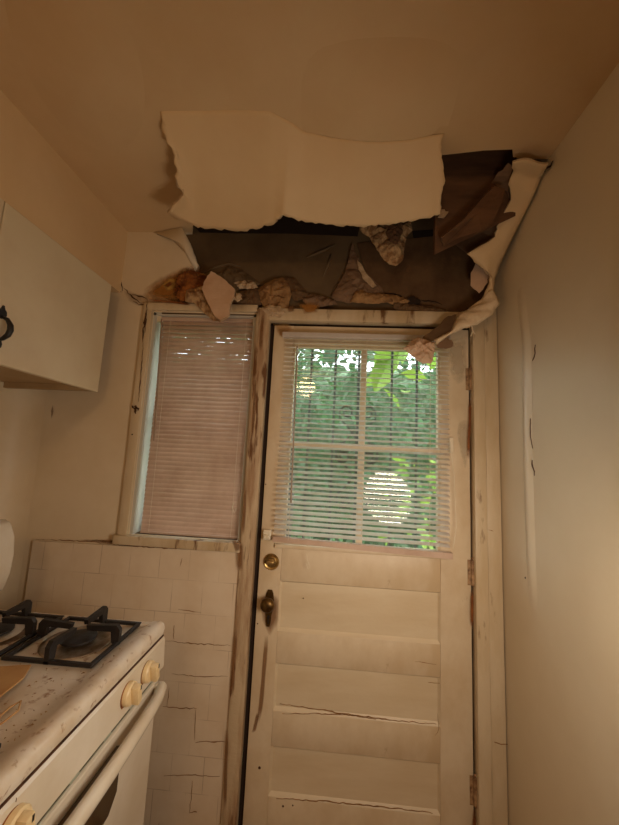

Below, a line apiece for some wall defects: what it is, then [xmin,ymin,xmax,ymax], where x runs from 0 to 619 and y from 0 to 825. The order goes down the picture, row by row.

spalling [154,228,199,272]
crack [163,674,224,743]
crack [166,774,220,813]